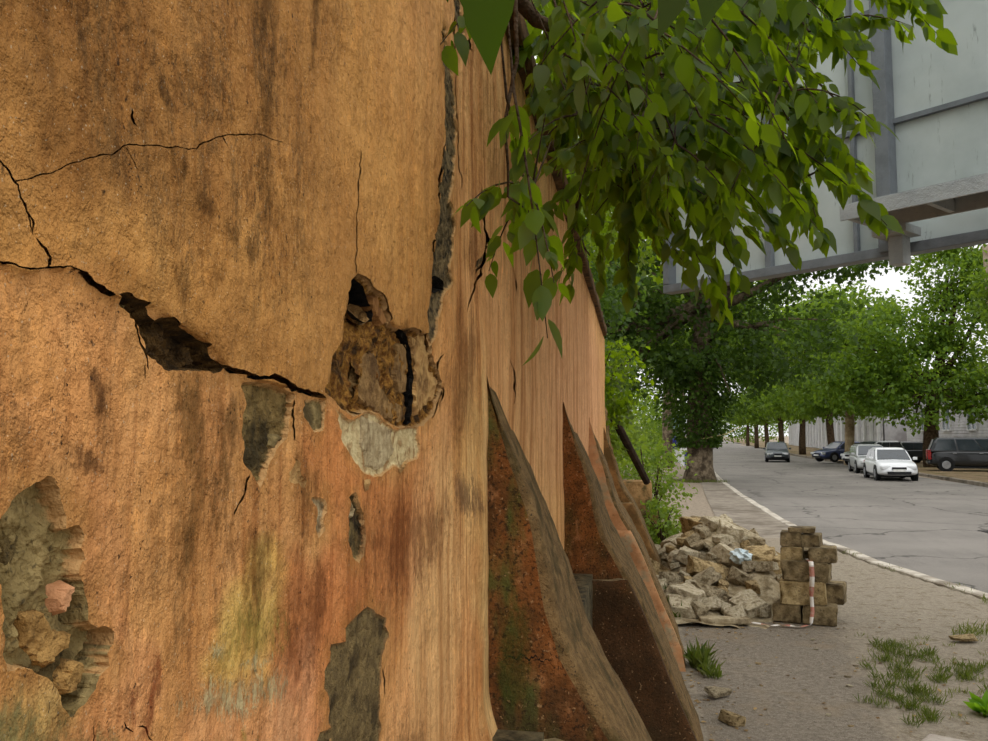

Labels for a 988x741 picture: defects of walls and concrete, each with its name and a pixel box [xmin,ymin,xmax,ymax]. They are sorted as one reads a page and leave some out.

crack [226,370,313,397]
flaking render [241,273,442,563]
spalling [0,476,115,718]